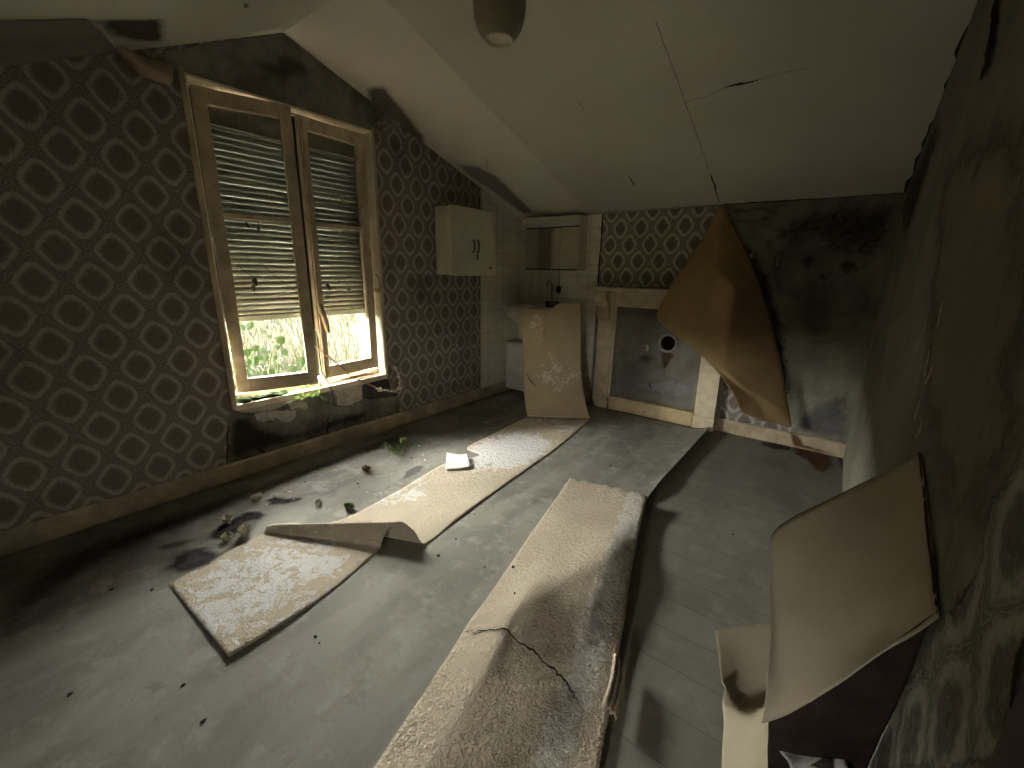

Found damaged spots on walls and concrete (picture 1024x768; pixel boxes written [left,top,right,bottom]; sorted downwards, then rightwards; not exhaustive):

crack [527,22,933,217]
crack [944,26,968,90]
peeling [657,205,791,427]
flaking render [226,377,400,463]
water stain [800,400,845,435]
peeling [761,454,940,723]